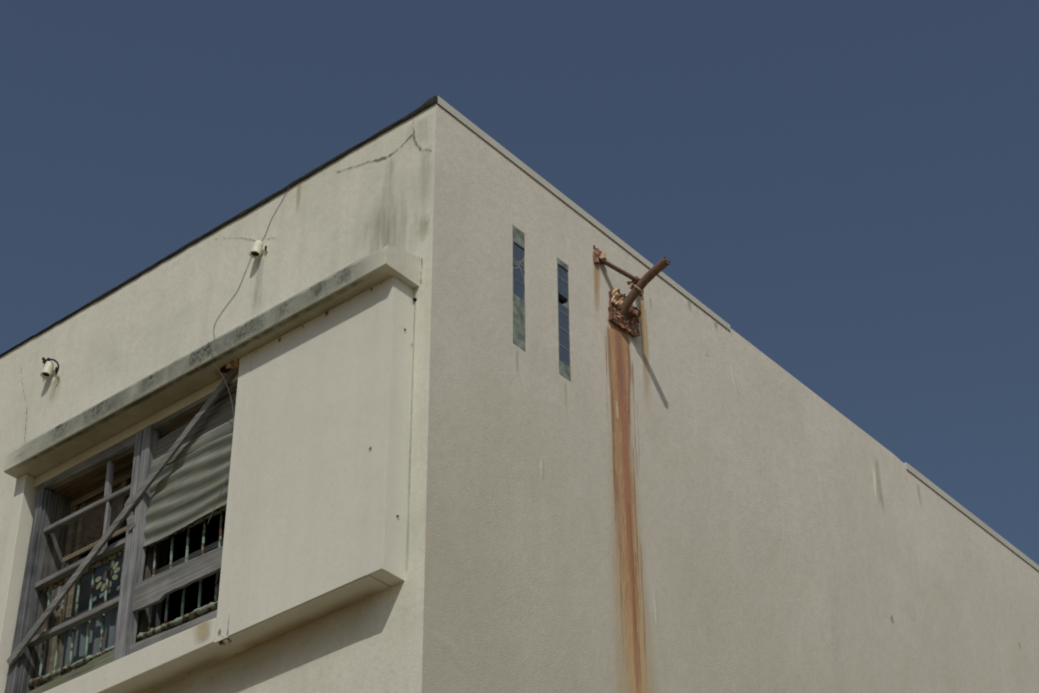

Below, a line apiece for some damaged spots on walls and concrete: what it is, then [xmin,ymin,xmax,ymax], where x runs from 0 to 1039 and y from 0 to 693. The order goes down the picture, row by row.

crack [337,119,431,172]
leakage [31,263,356,459]
corrosion [606,320,647,693]